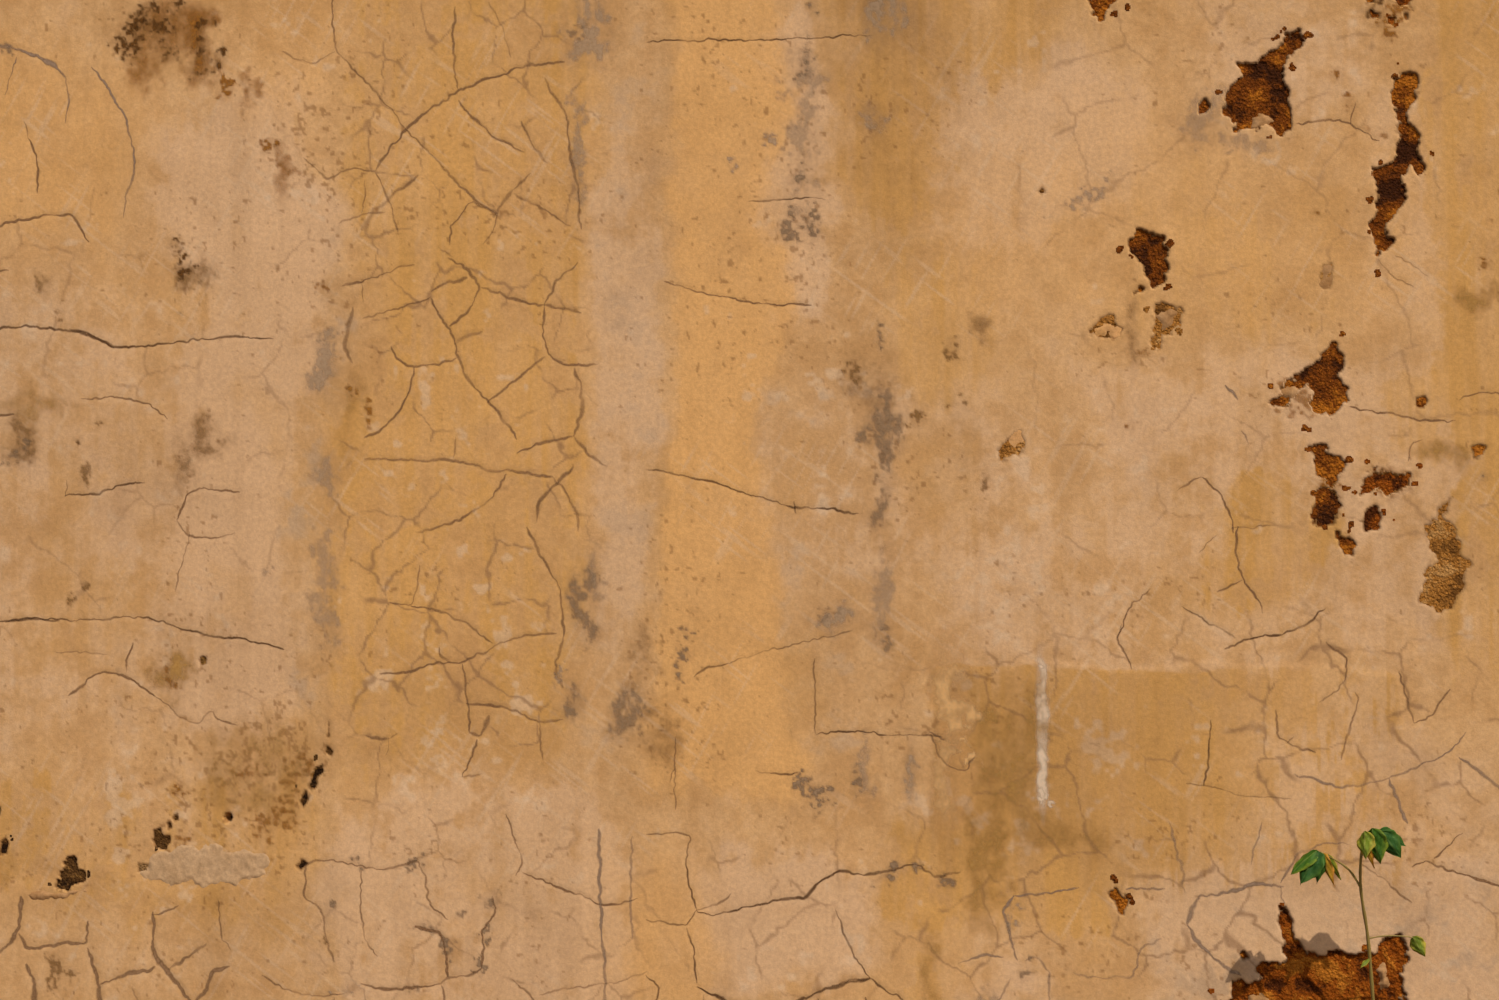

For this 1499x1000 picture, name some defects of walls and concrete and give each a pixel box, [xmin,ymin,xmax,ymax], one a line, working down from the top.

spalling [1199,26,1314,139]
spalling [1366,62,1434,277]
crack [0,324,272,348]
spalling [1116,229,1183,350]
crack [366,187,596,635]
spalling [1268,331,1423,555]
peeling [1419,500,1471,613]
leakage [932,639,1054,817]
crack [3,896,229,1000]
crack [303,860,496,1000]
crack [681,864,914,1000]
spalling [1231,903,1408,1000]